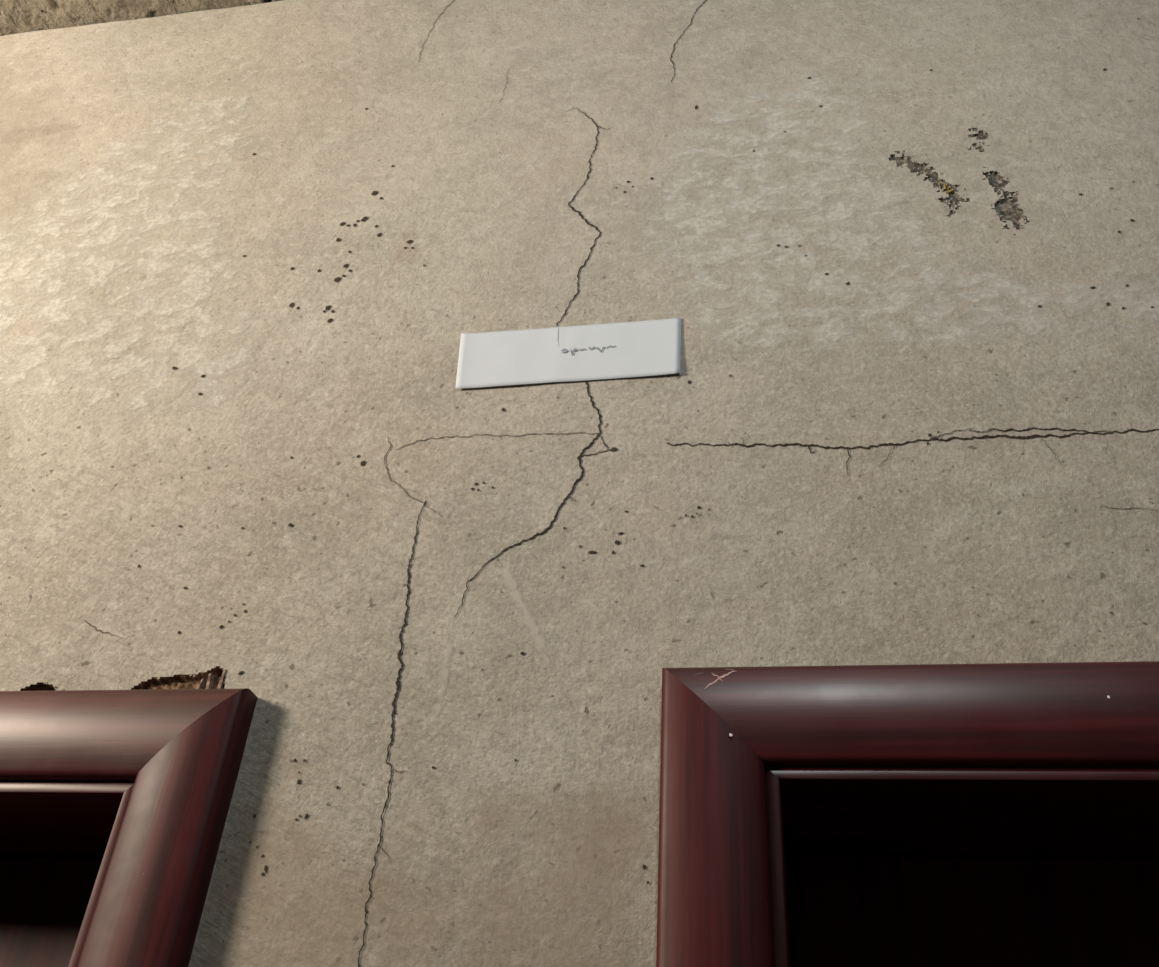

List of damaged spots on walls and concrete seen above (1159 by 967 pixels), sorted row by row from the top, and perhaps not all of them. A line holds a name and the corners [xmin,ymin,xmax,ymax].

crack [670,0,706,82]
spalling [967,127,989,152]
crack [556,107,612,327]
spalling [889,150,970,218]
spalling [981,167,1030,235]
crack [667,427,1159,473]
spalling [131,666,244,690]
crack [358,381,612,967]